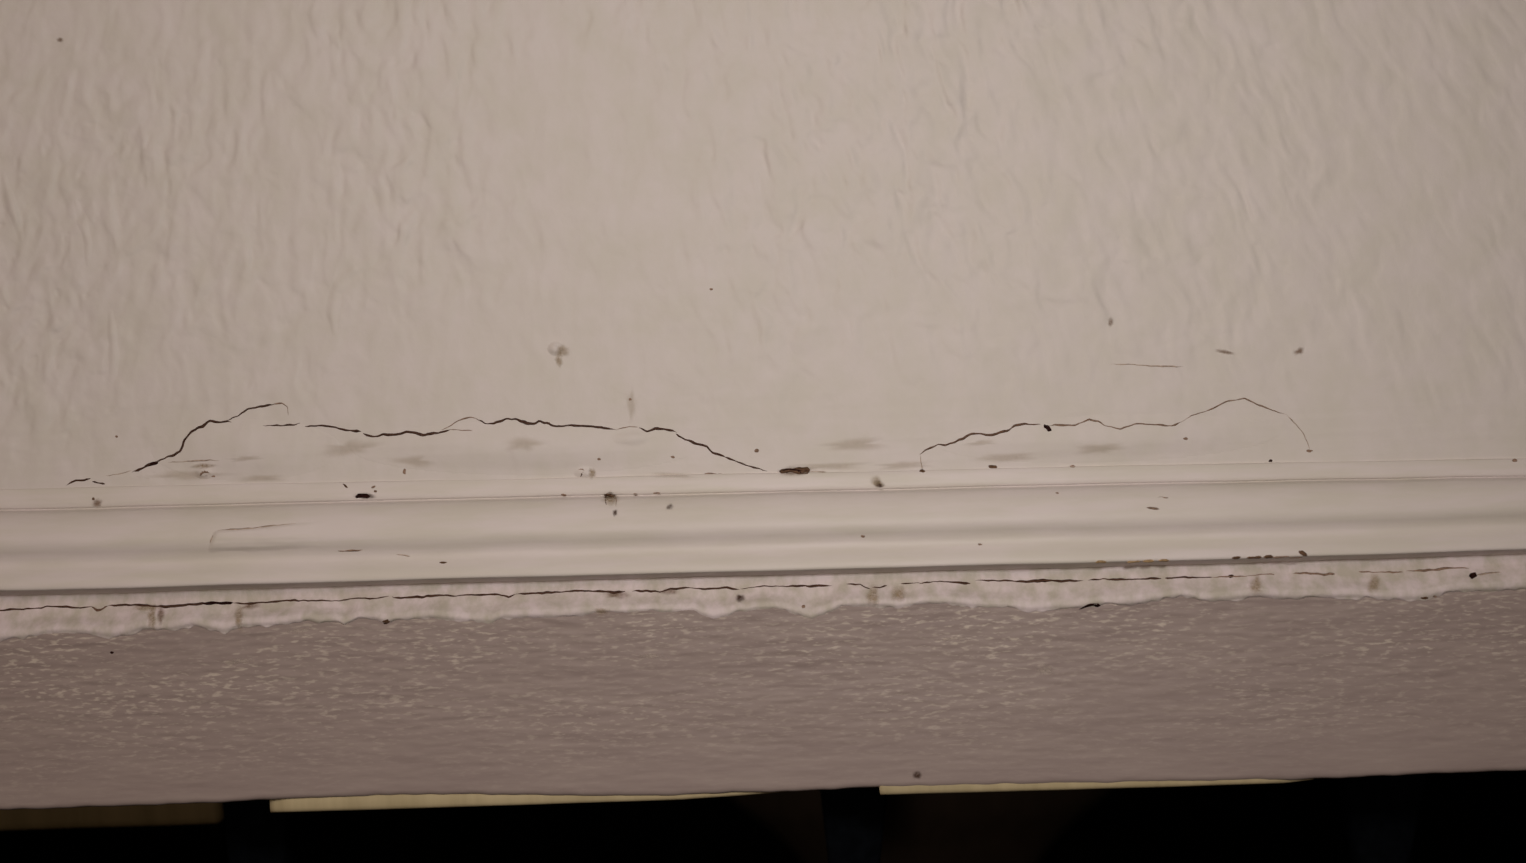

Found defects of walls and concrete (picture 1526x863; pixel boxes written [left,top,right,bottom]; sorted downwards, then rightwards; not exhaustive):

crack [67,402,765,485]
crack [920,398,1310,467]